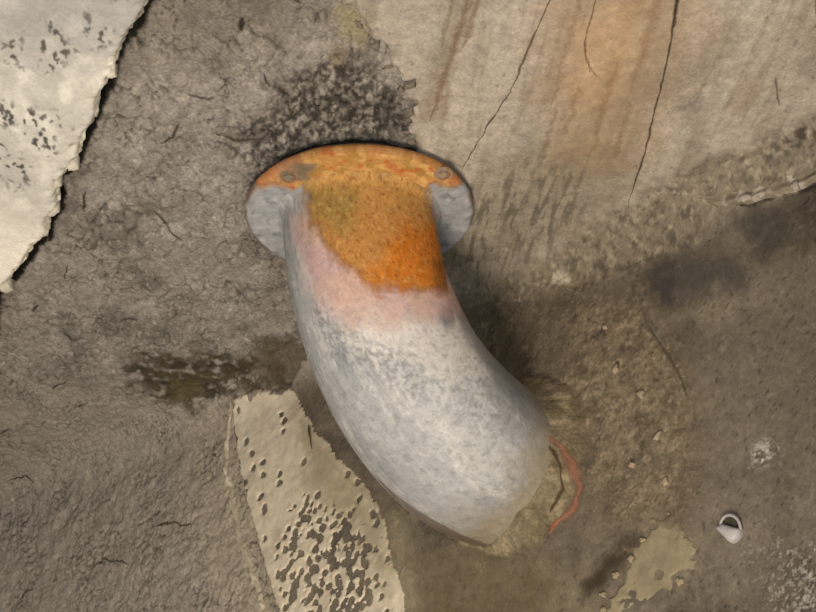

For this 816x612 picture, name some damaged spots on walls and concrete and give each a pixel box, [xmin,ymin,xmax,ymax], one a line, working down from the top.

water stain [250,63,408,184]
crack [462,0,550,169]
crack [584,0,596,72]
crack [628,0,678,205]
spalling [0,0,420,612]